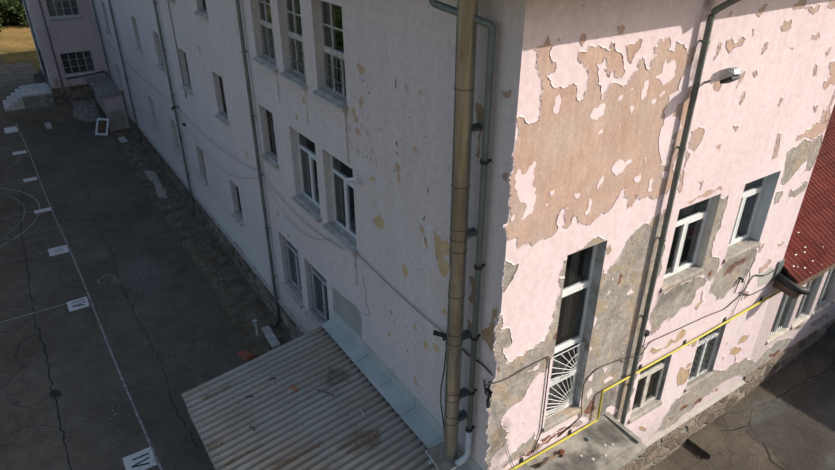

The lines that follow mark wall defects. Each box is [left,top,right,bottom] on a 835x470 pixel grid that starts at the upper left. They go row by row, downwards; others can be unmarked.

peeling [501,24,705,248]
peeling [713,28,755,60]
peeling [736,69,758,105]
spalling [772,46,835,205]
peeling [780,0,835,32]
peeling [419,216,450,285]
spalling [466,258,567,470]
spalling [500,179,772,470]